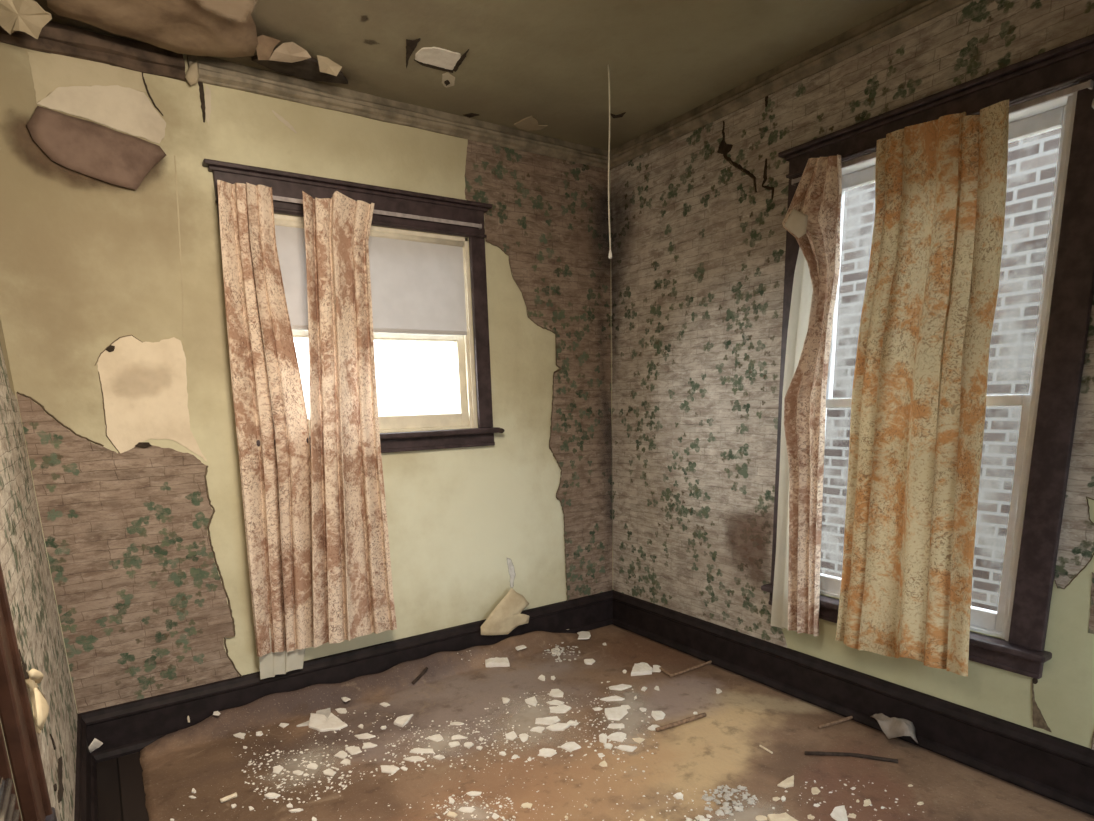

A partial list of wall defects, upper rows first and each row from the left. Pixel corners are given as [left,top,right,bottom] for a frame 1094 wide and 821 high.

peeling [0,0,52,39]
spalling [28,52,166,144]
spalling [406,38,469,88]
crack [717,121,774,200]
spalling [95,335,207,461]
peeling [28,668,64,803]